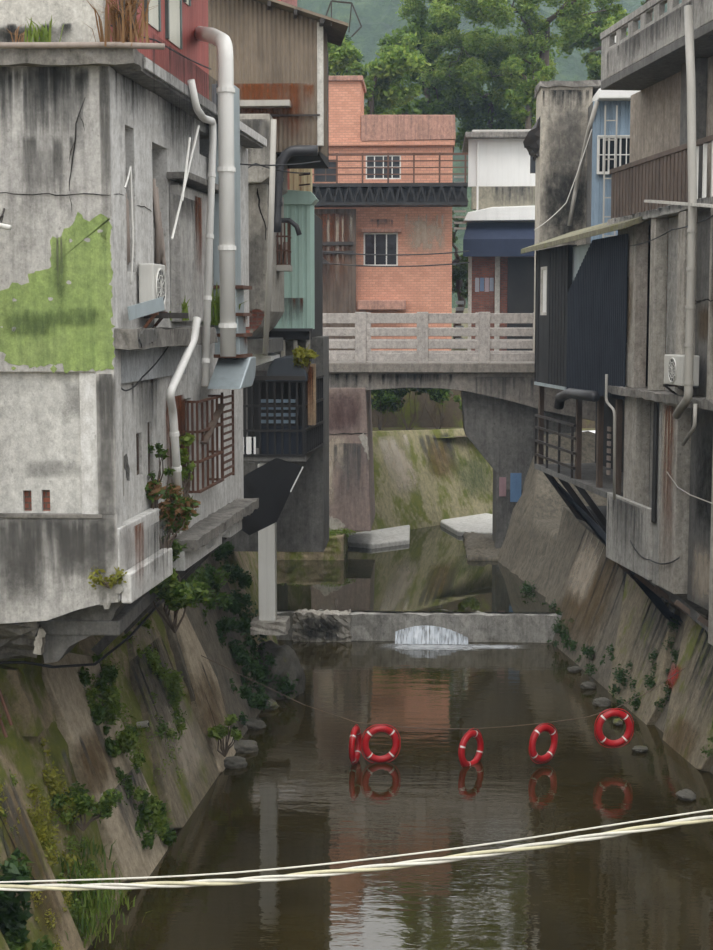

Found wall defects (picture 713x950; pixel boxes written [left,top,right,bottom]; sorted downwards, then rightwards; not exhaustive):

leakage [0,66,88,119]
leakage [100,66,137,128]
rust [234,83,313,122]
crack [0,99,151,211]